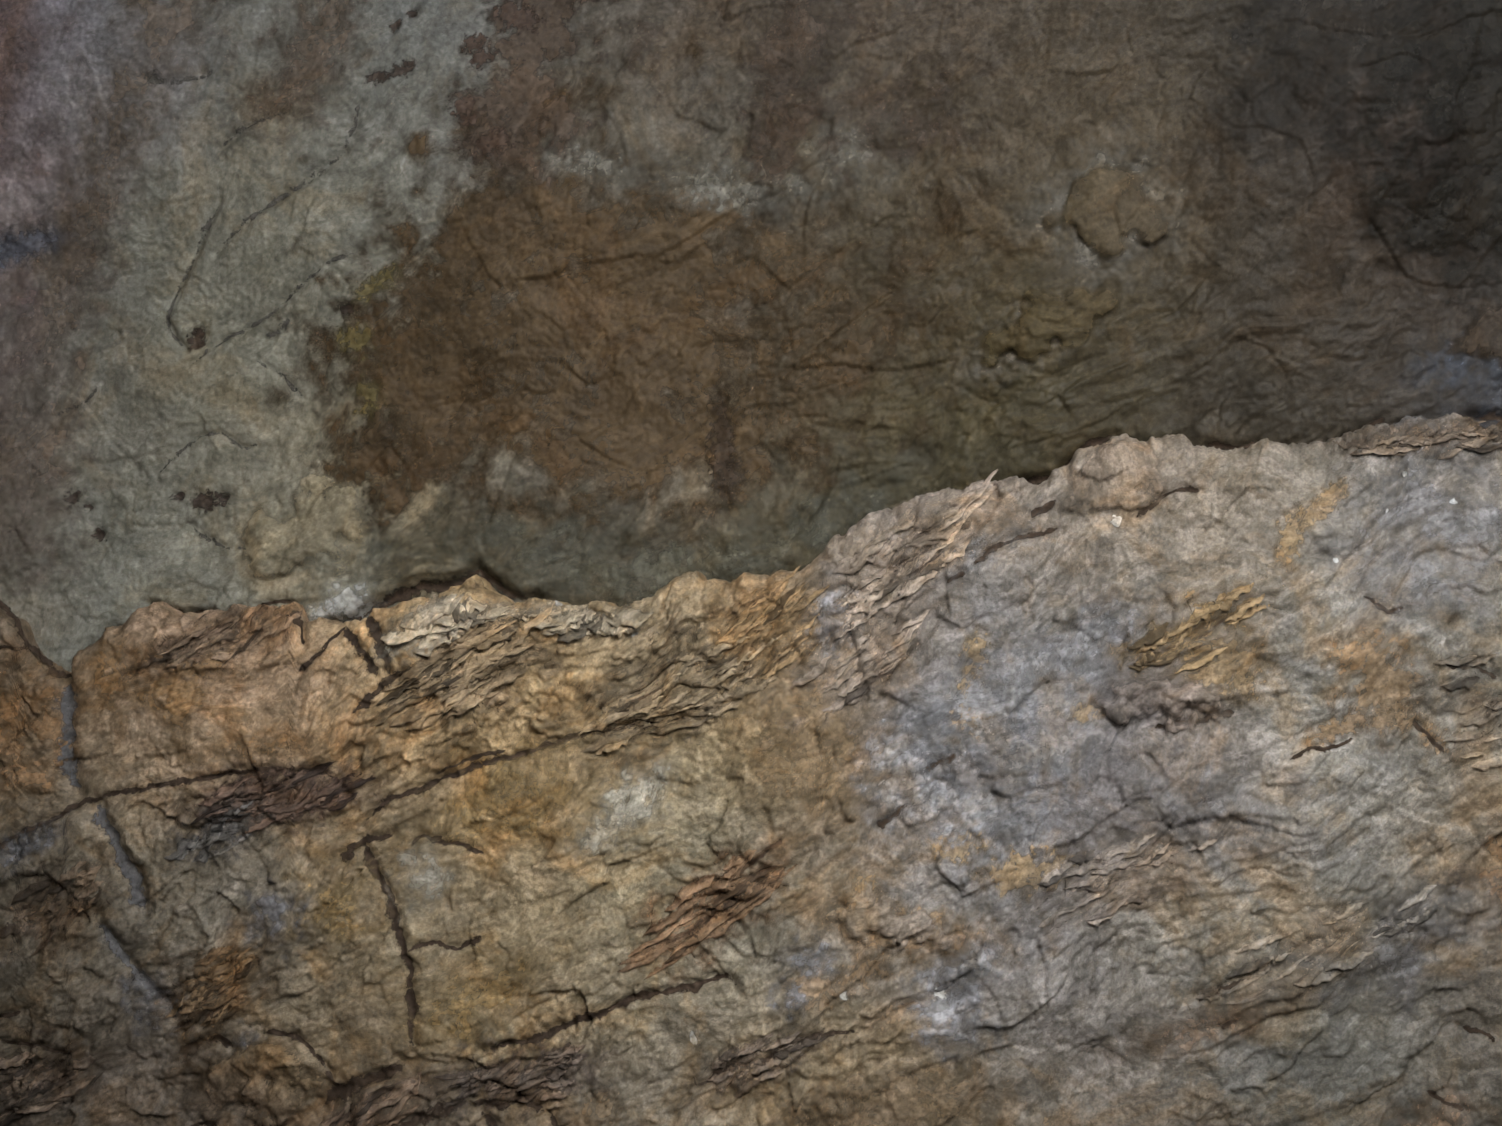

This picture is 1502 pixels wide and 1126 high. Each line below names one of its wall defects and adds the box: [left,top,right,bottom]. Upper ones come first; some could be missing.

spalling [1333,417,1502,459]
peeling [63,490,94,511]
peeling [169,489,230,514]
spalling [128,603,303,680]
crack [262,568,529,713]
spalling [369,581,653,742]
spalling [576,469,1003,762]
spalling [1127,582,1271,681]
crack [0,600,653,1104]
crack [399,1098,558,1126]